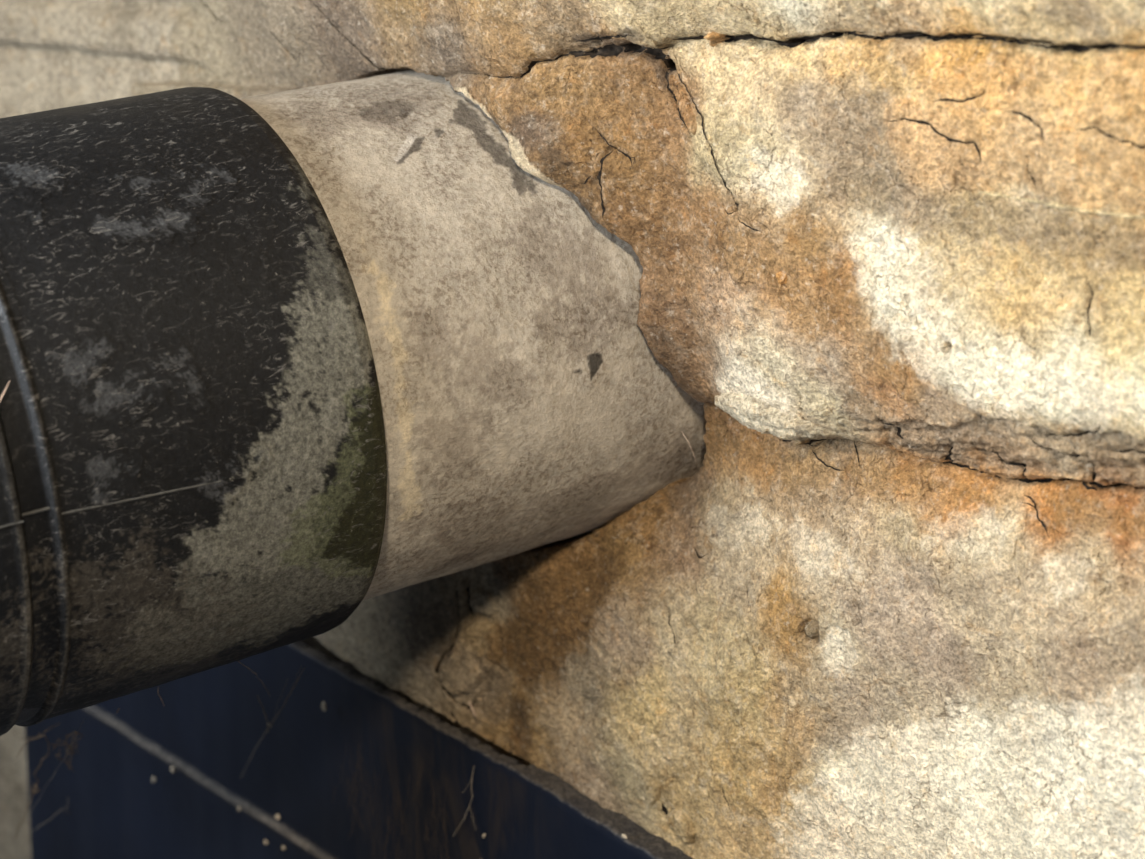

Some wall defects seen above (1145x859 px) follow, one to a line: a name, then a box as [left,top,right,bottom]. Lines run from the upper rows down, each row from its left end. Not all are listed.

crack [465,31,1145,232]
crack [434,582,501,722]
damp [659,467,1145,859]